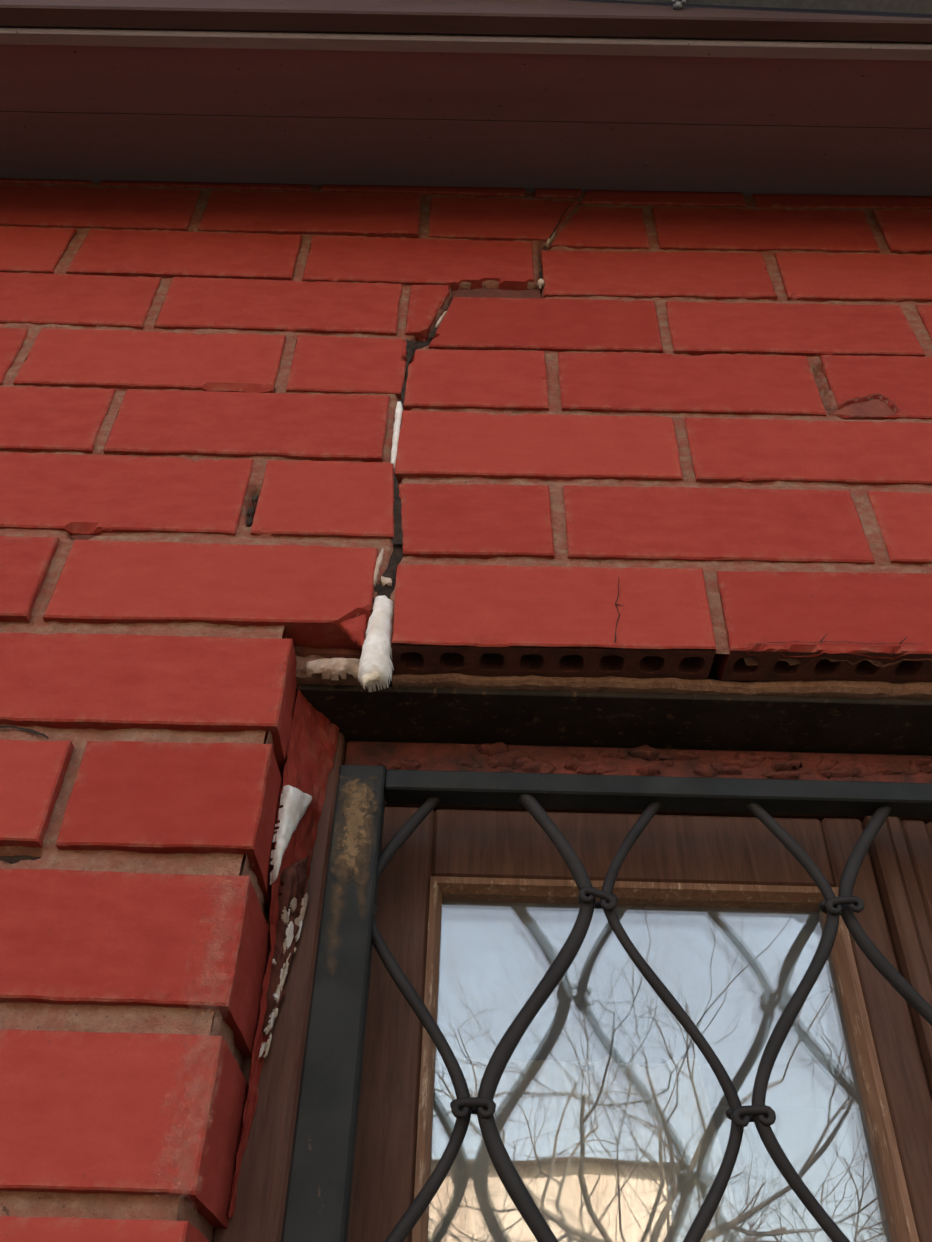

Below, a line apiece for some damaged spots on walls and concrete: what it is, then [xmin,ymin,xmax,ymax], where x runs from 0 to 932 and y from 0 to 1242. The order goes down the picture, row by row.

crack [537,195,577,288]
crack [401,299,453,403]
spalling [828,393,902,420]
crack [371,471,403,612]
crack [615,577,624,642]
spalling [259,854,309,1058]